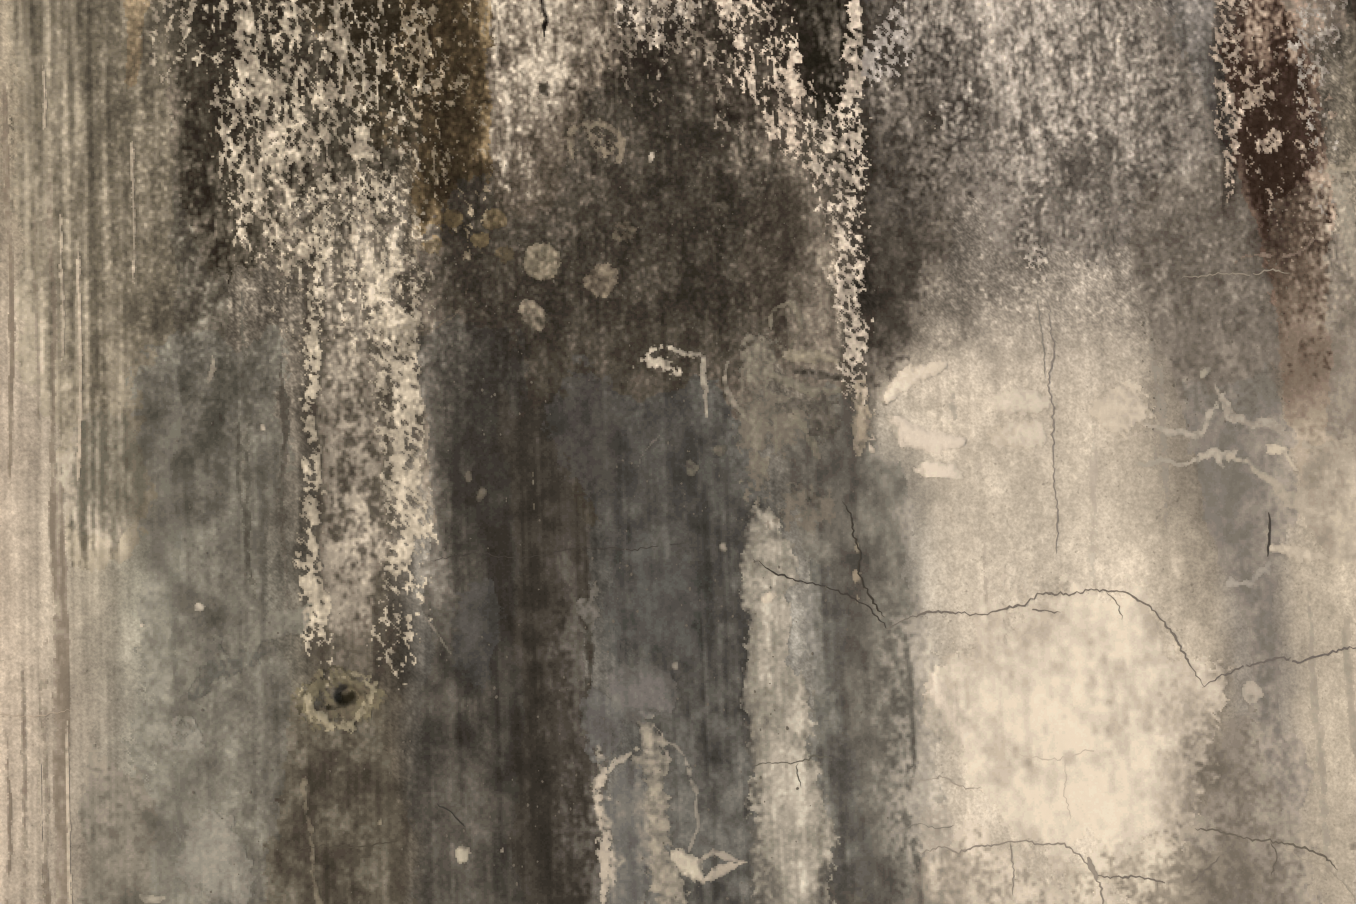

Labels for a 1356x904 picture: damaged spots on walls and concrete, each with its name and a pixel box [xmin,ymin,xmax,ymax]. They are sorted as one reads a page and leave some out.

spalling [290,665,388,734]
water stain [1,0,872,904]
crack [753,501,1356,687]
water stain [781,393,1332,904]
water stain [840,0,1356,663]
crack [902,746,1356,904]
corrosion [1219,0,1338,472]